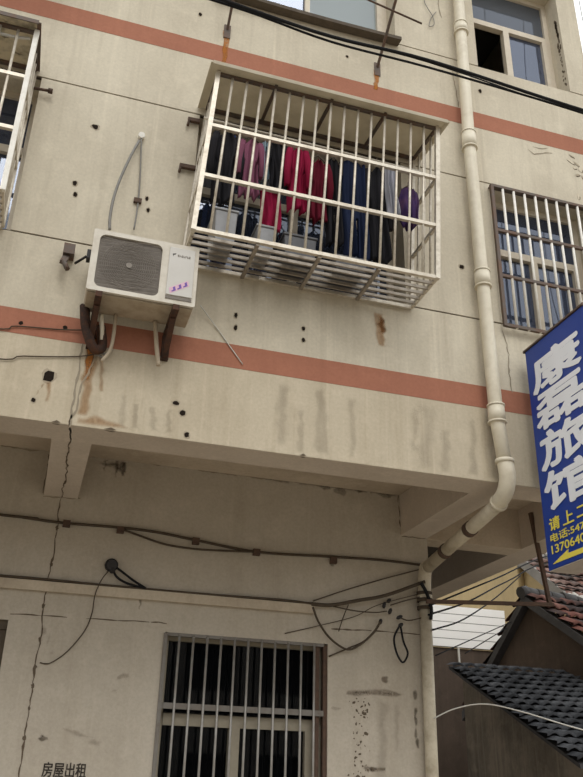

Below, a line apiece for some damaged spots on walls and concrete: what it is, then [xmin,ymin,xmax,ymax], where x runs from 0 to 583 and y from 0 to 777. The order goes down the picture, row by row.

rust [85,349,94,379]
crack [0,343,97,777]
crack [86,617,167,625]
peeling [348,698,374,777]